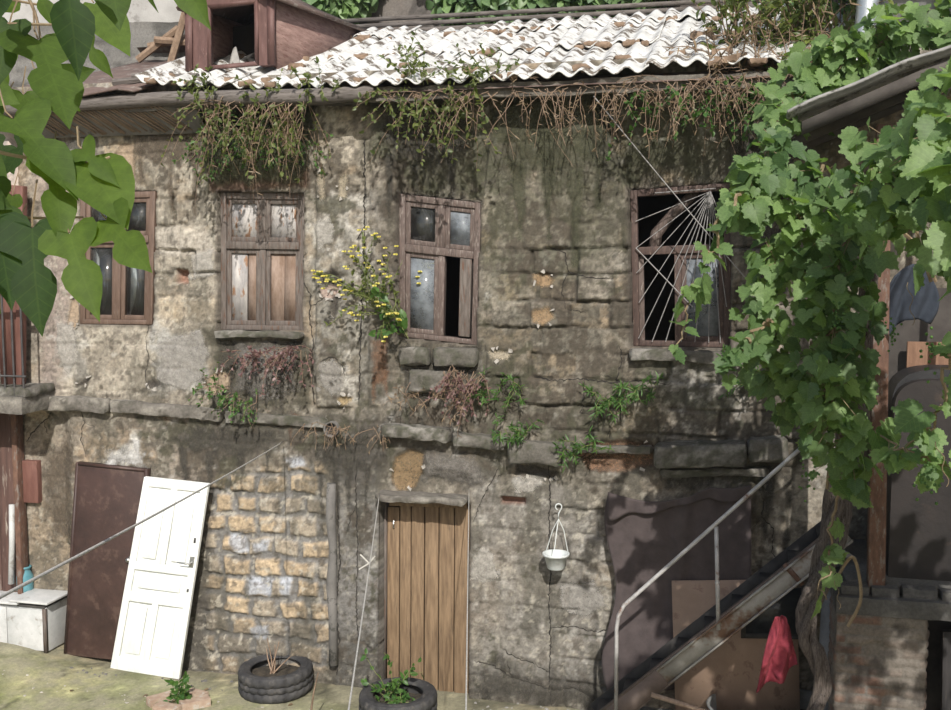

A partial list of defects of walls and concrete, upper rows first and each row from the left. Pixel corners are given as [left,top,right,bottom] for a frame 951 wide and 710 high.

crack [303,139,366,404]
leakage [317,433,369,531]
spalling [389,450,426,491]
crack [473,466,606,706]